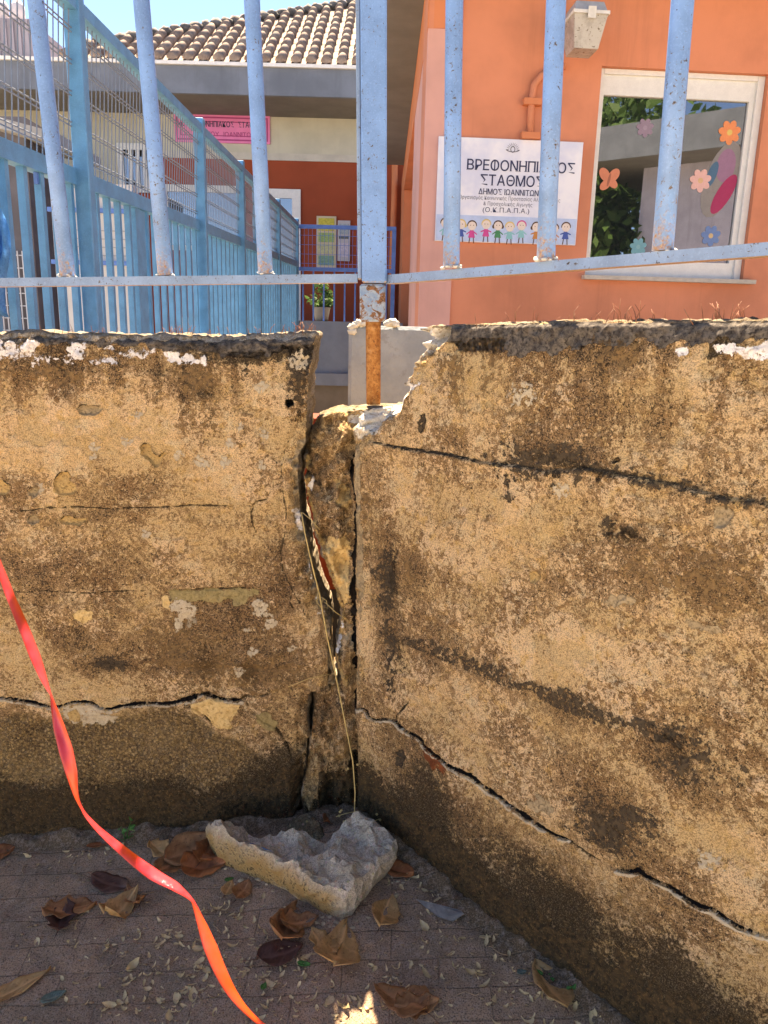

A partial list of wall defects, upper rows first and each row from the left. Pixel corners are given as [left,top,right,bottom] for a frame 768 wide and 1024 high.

water stain [0,336,316,438]
spalling [348,327,451,440]
crack [0,691,266,721]
crack [349,442,768,943]
water stain [0,756,304,837]
water stain [318,740,746,1024]